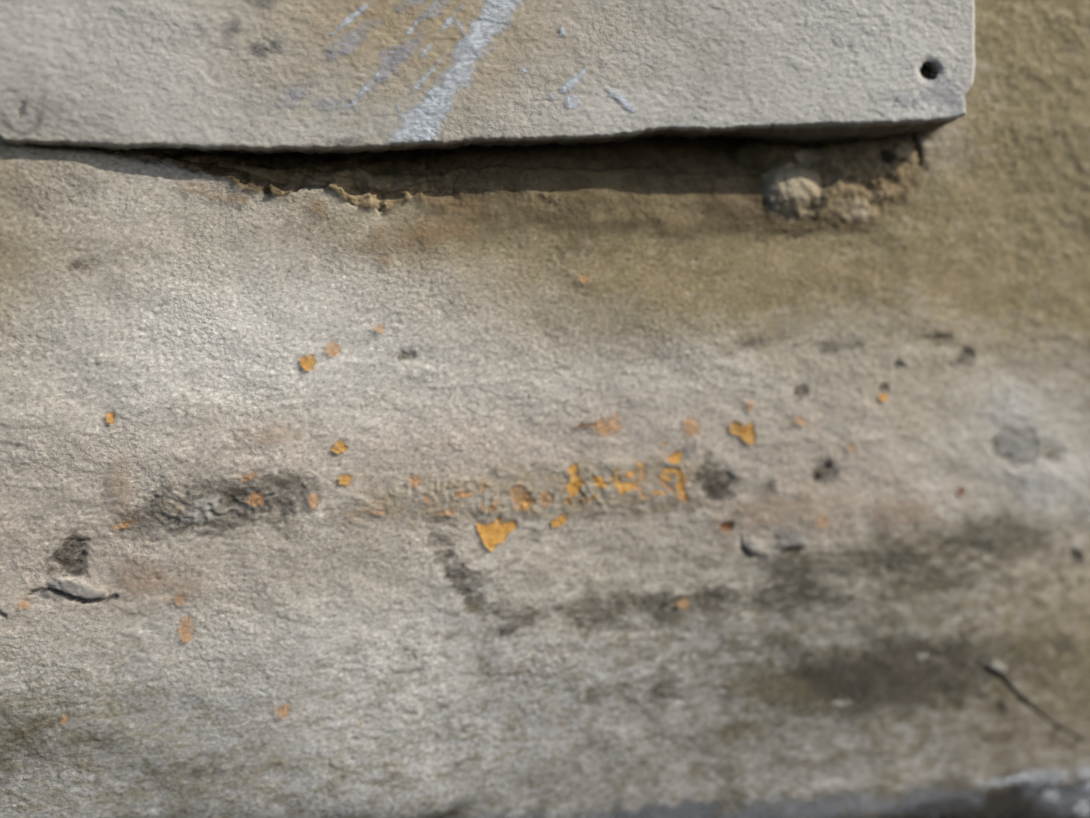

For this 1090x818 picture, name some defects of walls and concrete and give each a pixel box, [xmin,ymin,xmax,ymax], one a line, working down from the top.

flaking render [121,135,927,235]
flaking render [41,531,104,601]
crack [985,661,1079,741]
leakage [596,795,890,818]
efflorescence [982,767,1090,816]